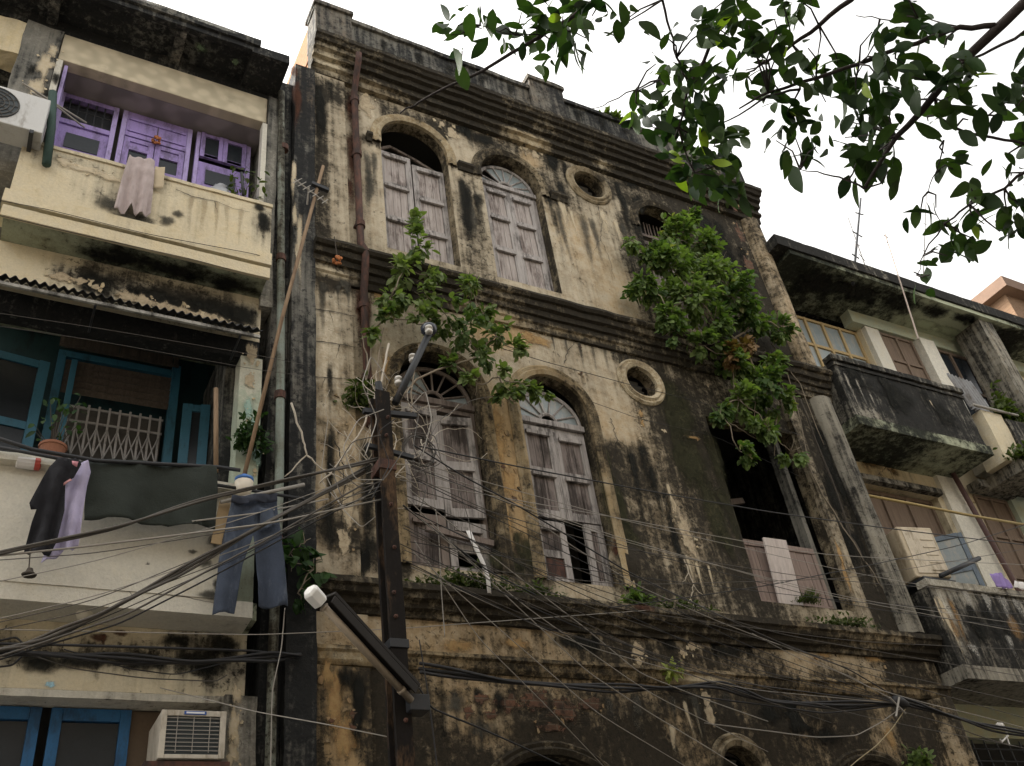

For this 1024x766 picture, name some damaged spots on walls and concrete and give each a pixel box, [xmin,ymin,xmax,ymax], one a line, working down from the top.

water stain [315,80,333,141]
corrosion [347,95,361,203]
water stain [293,206,302,269]
water stain [458,179,482,235]
peeling [45,272,233,328]
water stain [77,247,260,324]
water stain [597,451,641,548]
water stain [627,442,713,584]
water stain [934,597,956,636]
water stain [11,652,104,672]
water stain [117,634,237,677]
flaking render [463,686,604,734]